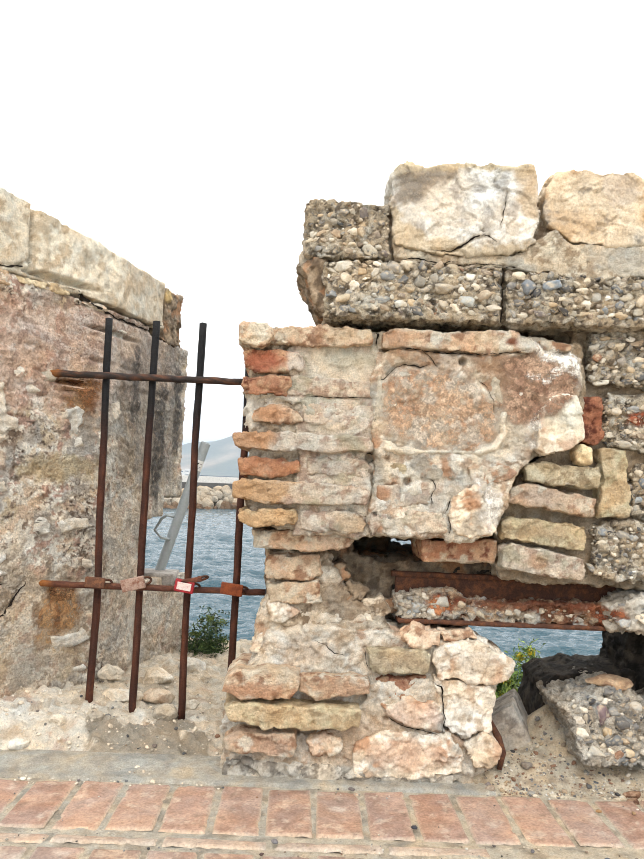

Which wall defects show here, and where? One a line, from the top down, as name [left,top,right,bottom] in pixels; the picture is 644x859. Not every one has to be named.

crack [395,195,516,322]
rust [428,593,629,625]